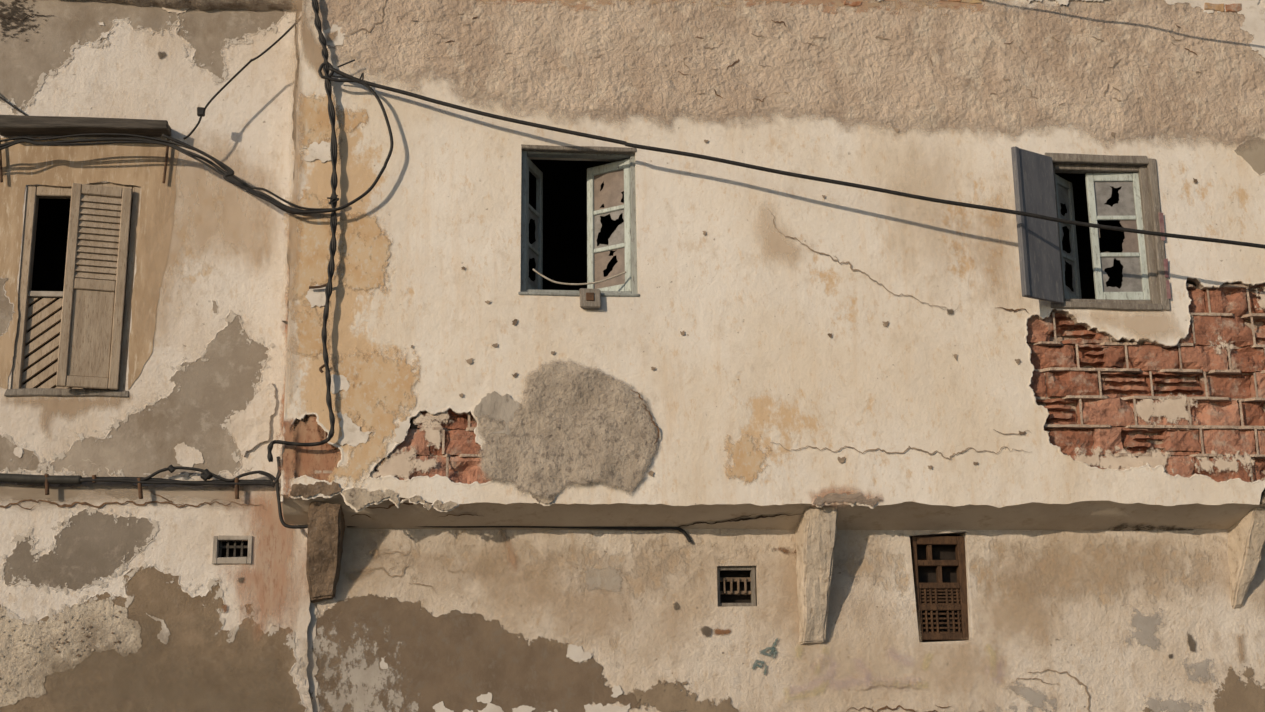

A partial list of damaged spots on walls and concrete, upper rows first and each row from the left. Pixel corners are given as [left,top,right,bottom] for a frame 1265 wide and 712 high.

flaking render [0,0,1265,177]
peeling [0,277,15,336]
crack [768,209,959,310]
flaking render [1015,276,1265,508]
peeling [0,299,320,712]
peeling [633,673,739,712]